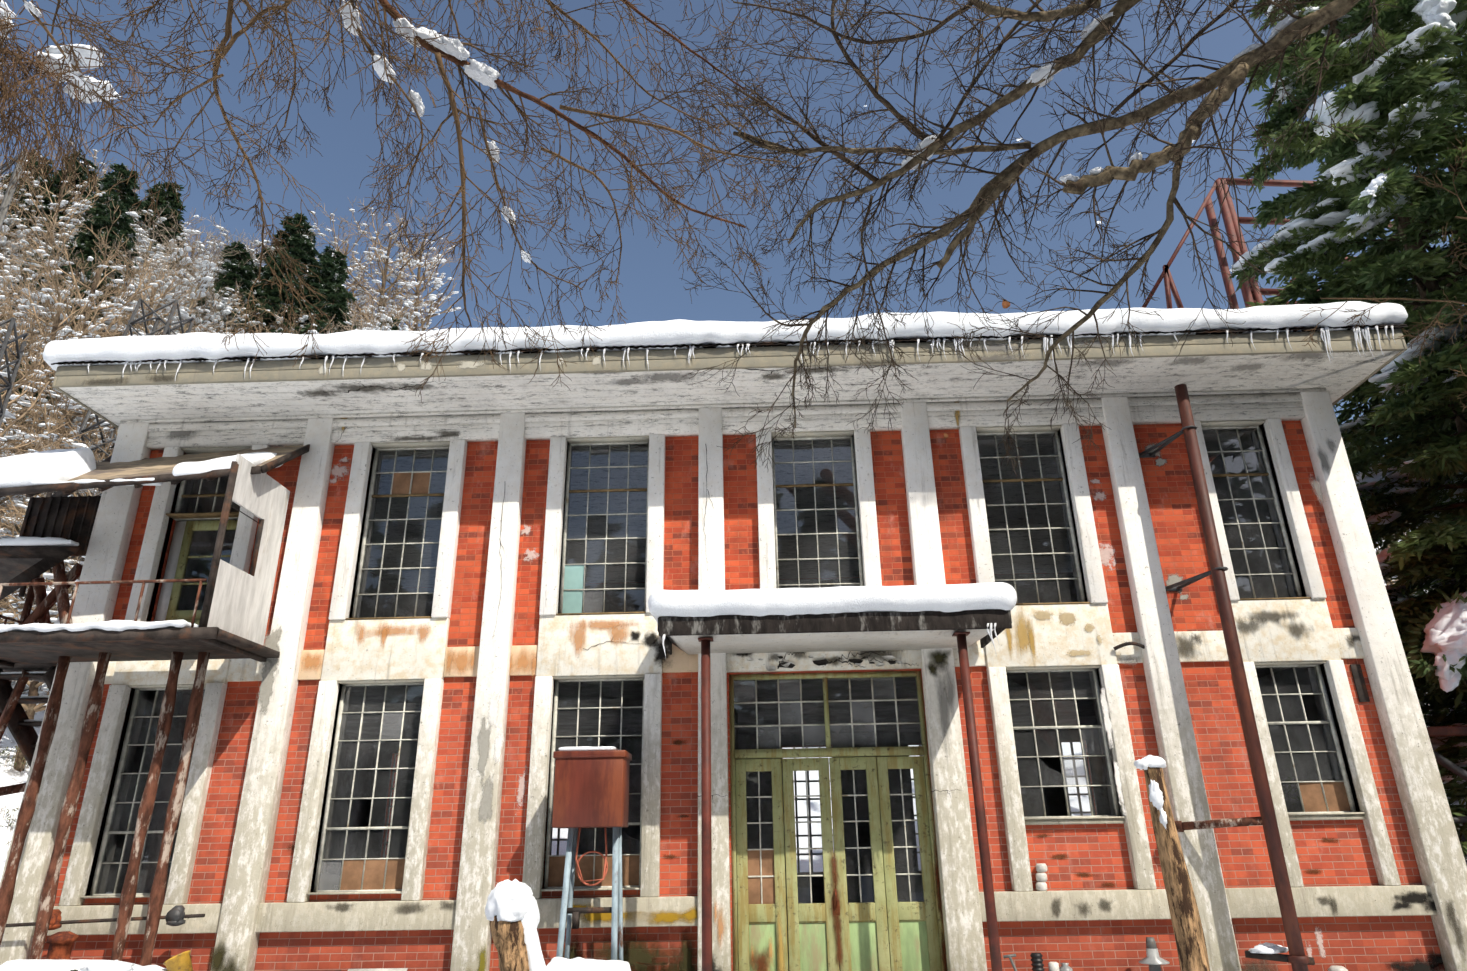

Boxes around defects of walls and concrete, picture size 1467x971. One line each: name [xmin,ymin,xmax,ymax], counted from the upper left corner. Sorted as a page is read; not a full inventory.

corrosion [359,627,428,644]
corrosion [574,621,626,651]
leakage [1238,611,1305,638]
peeling [477,690,503,822]
leakage [211,944,237,971]
corrosion [752,919,784,971]
corrosion [831,855,843,964]
corrosion [934,856,942,918]
leakage [1390,953,1443,971]
leakage [1394,892,1464,949]